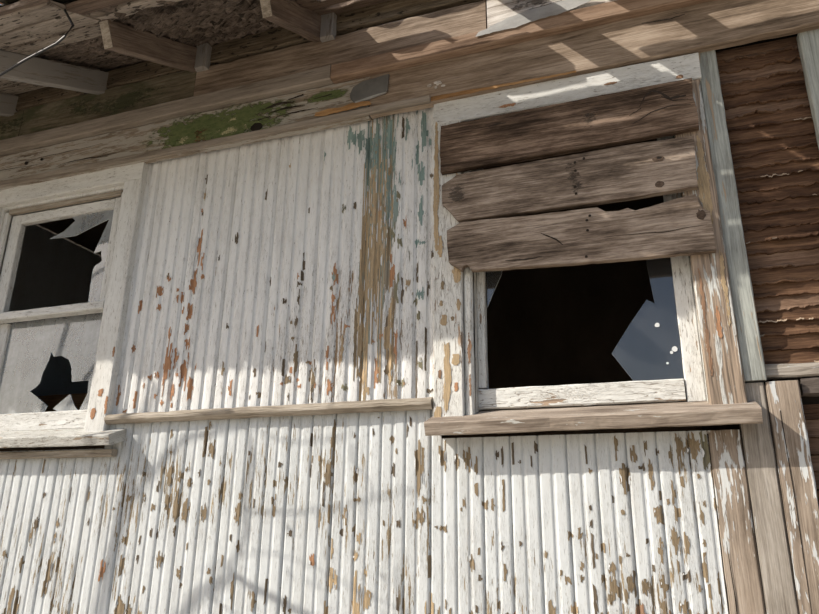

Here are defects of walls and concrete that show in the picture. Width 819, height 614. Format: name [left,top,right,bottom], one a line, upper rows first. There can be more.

crack [629,90,690,123]
peeling [326,116,430,401]
peeling [90,229,205,419]
peeling [280,316,316,403]
peeling [41,518,60,613]
peeling [142,465,211,537]
peeling [202,421,221,466]
peeling [310,419,336,528]
peeling [412,439,427,529]
peeling [438,440,505,512]
peeling [560,506,650,614]
peeling [614,431,724,614]